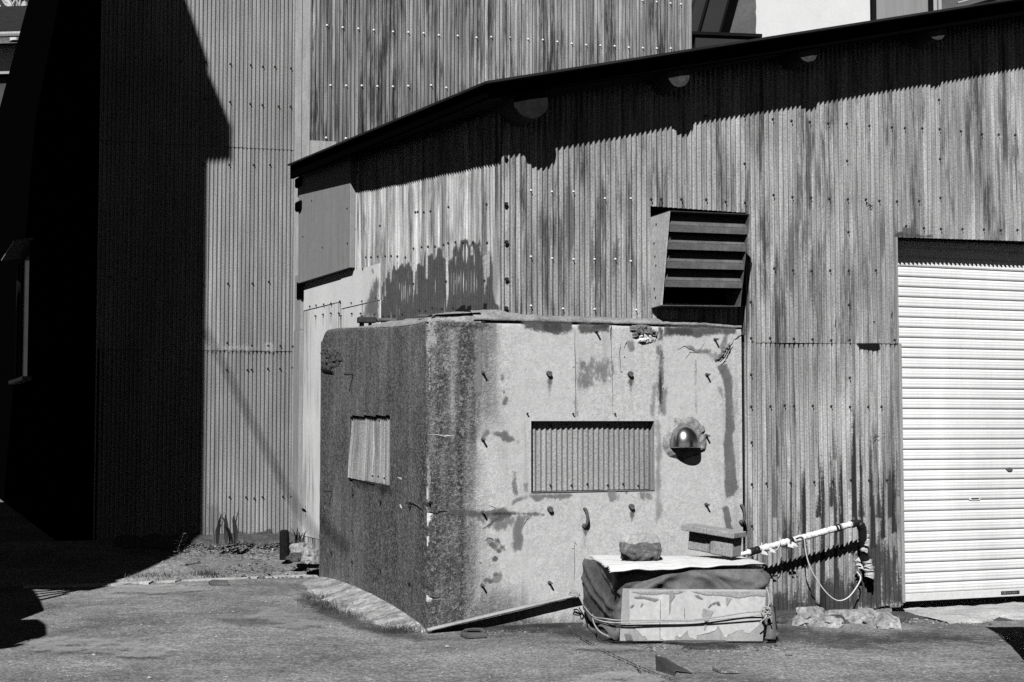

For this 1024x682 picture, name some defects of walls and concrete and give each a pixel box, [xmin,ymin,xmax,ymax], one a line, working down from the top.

damp [785,200,815,302]
spalling [320,347,343,374]
spalling [624,324,659,357]
damp [717,363,737,529]
damp [448,477,571,549]